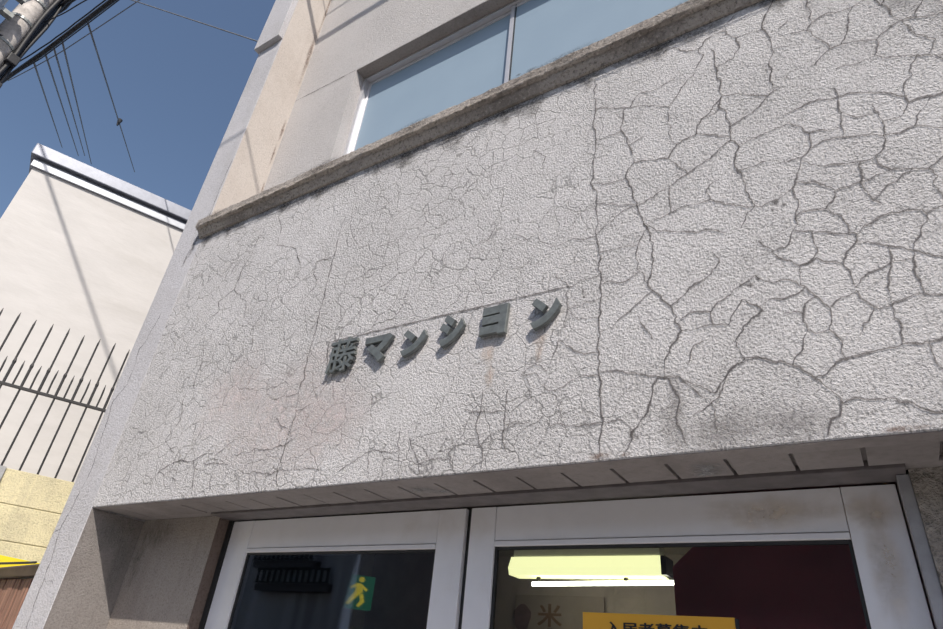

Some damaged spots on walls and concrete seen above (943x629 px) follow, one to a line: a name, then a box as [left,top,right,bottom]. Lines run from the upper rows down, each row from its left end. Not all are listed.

leakage [372,97,537,171]
crack [158,0,943,491]